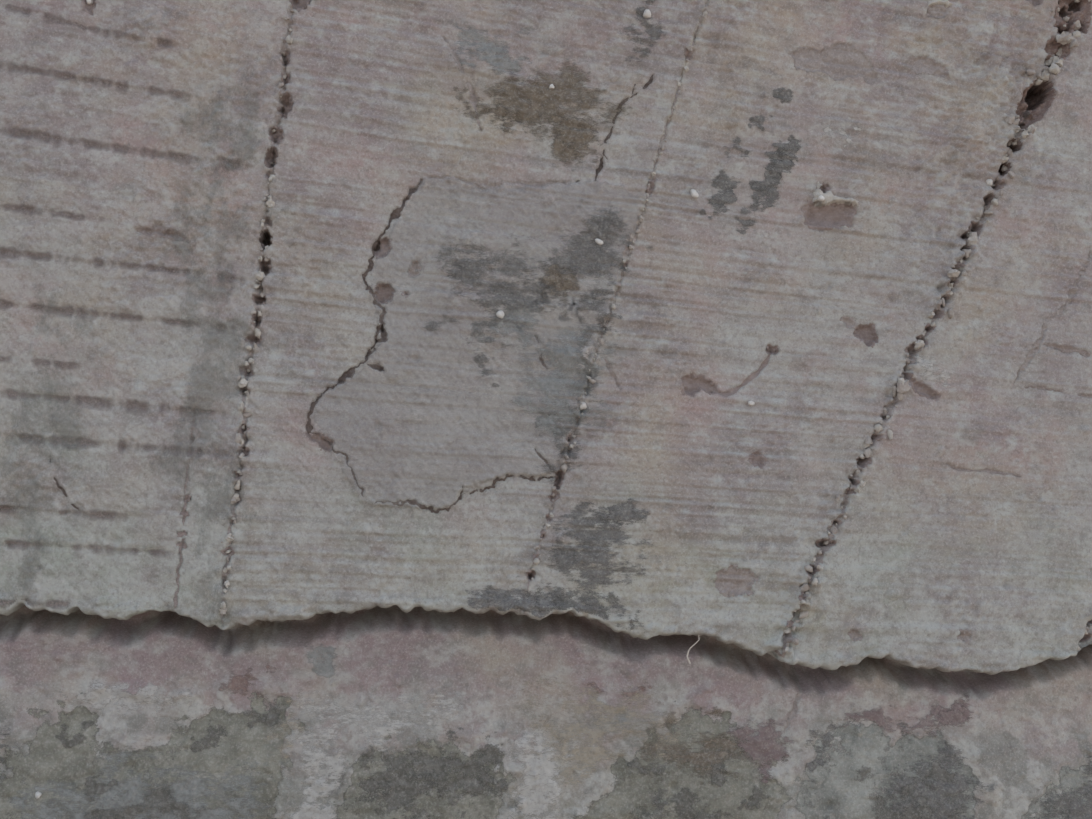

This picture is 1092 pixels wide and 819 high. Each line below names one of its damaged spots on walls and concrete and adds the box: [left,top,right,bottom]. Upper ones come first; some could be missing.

crack [306,0,710,599]